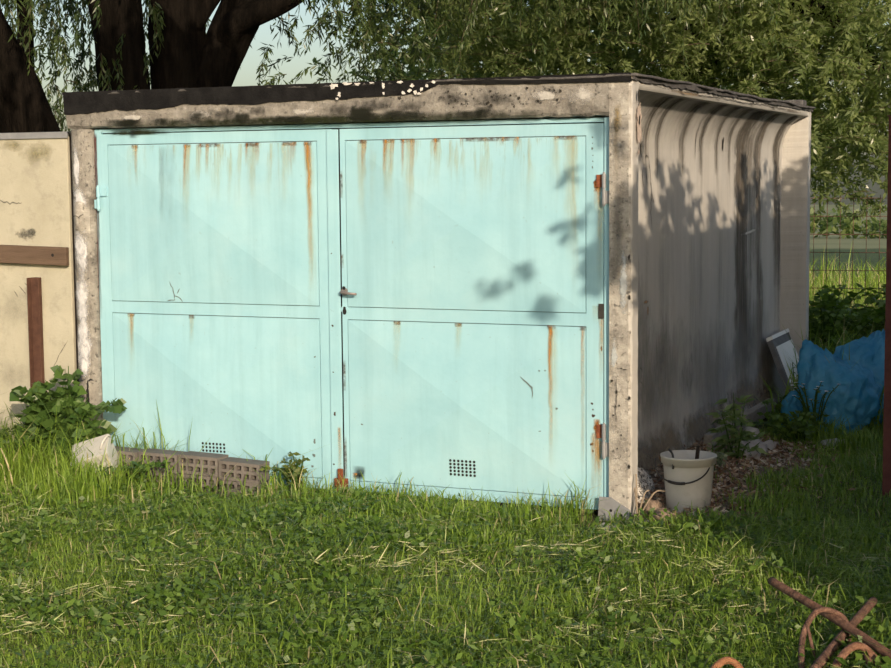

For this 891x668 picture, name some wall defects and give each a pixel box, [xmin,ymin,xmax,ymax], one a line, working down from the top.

leakage [109,95,509,136]
rust [283,142,310,205]
leakage [683,103,797,310]